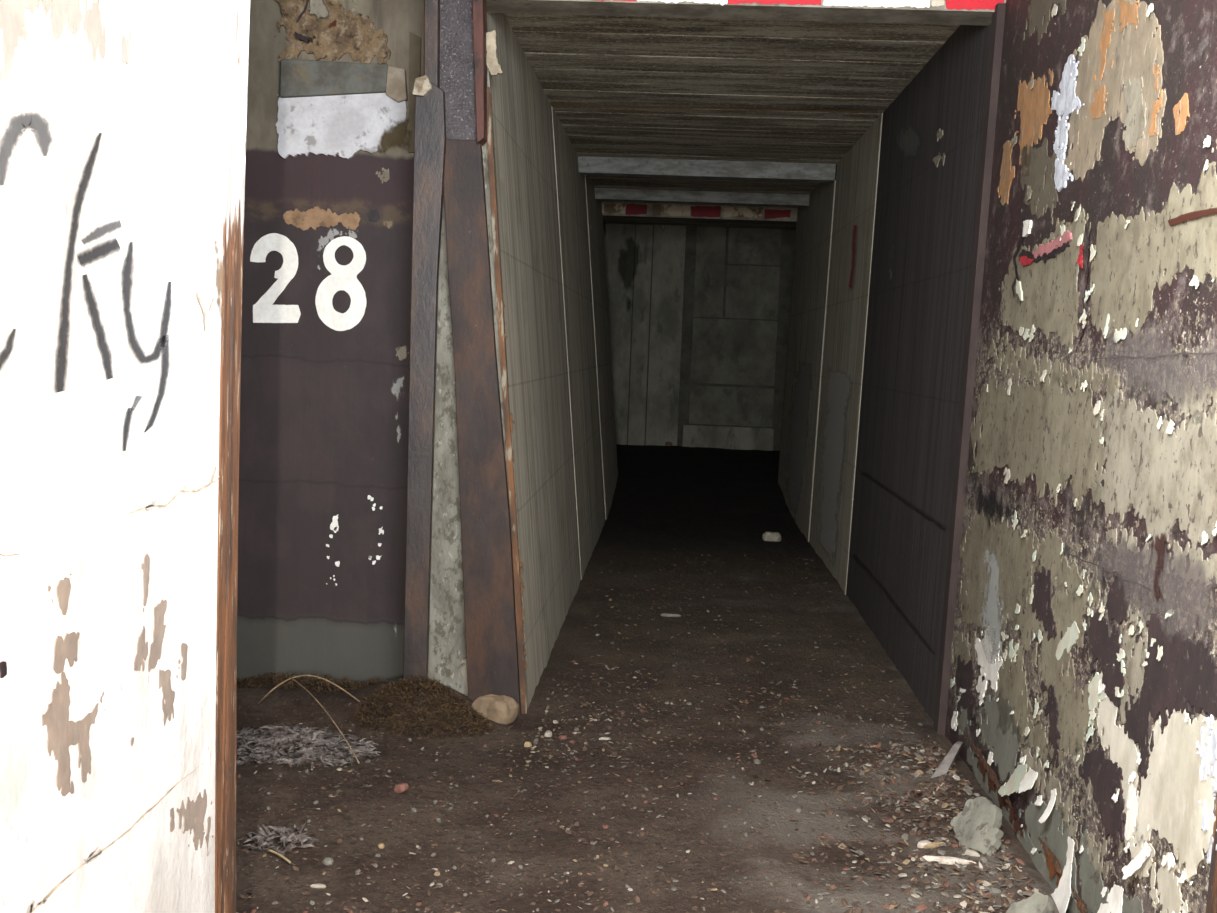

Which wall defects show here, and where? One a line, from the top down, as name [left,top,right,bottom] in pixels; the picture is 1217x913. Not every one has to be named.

peeling [408,32,421,153]
peeling [283,206,360,270]
peeling [970,0,1217,592]
crack [121,466,220,517]
peeling [48,574,71,615]
peeling [134,554,188,726]
peeling [42,632,105,796]
peeling [950,507,1217,913]
crack [25,763,203,913]
peeling [170,789,213,856]
corrosion [970,740,1027,836]
corrosion [1038,837,1088,913]